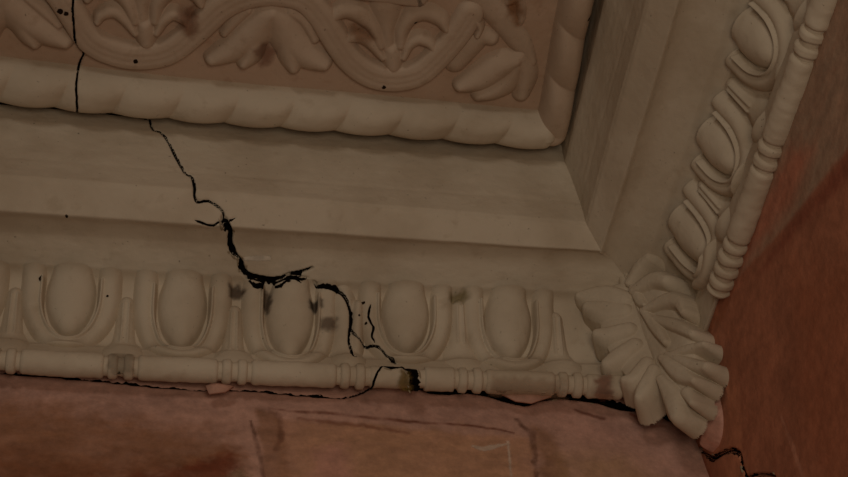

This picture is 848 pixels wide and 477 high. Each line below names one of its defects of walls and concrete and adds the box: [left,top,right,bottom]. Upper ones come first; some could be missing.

crack [49,0,85,111]
crack [99,113,636,412]
crack [0,372,207,391]
crack [700,447,776,477]